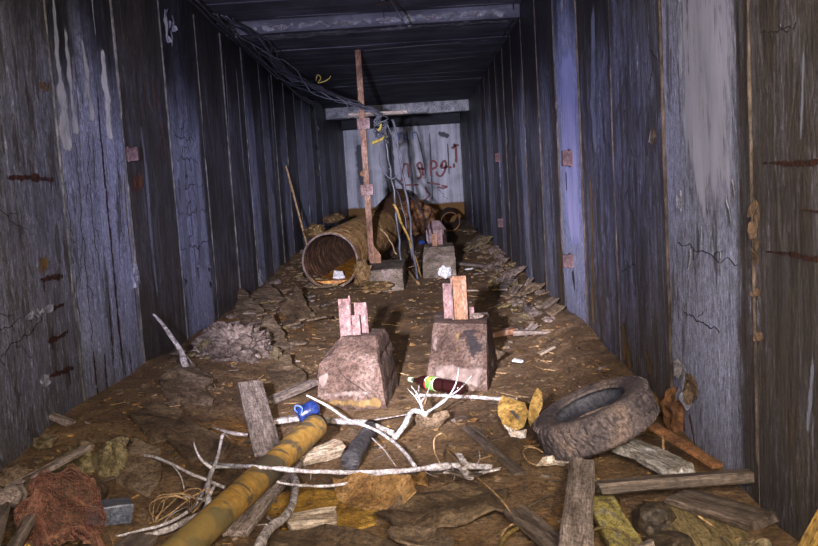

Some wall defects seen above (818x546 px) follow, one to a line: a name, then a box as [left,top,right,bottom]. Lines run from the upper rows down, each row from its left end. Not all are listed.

spalling [163,9,178,44]
damp [53,0,79,151]
damp [81,39,94,121]
damp [101,50,113,140]
rust [7,173,54,193]
crack [174,125,210,251]
rust [763,158,818,167]
crack [678,242,738,266]
crack [0,313,42,366]